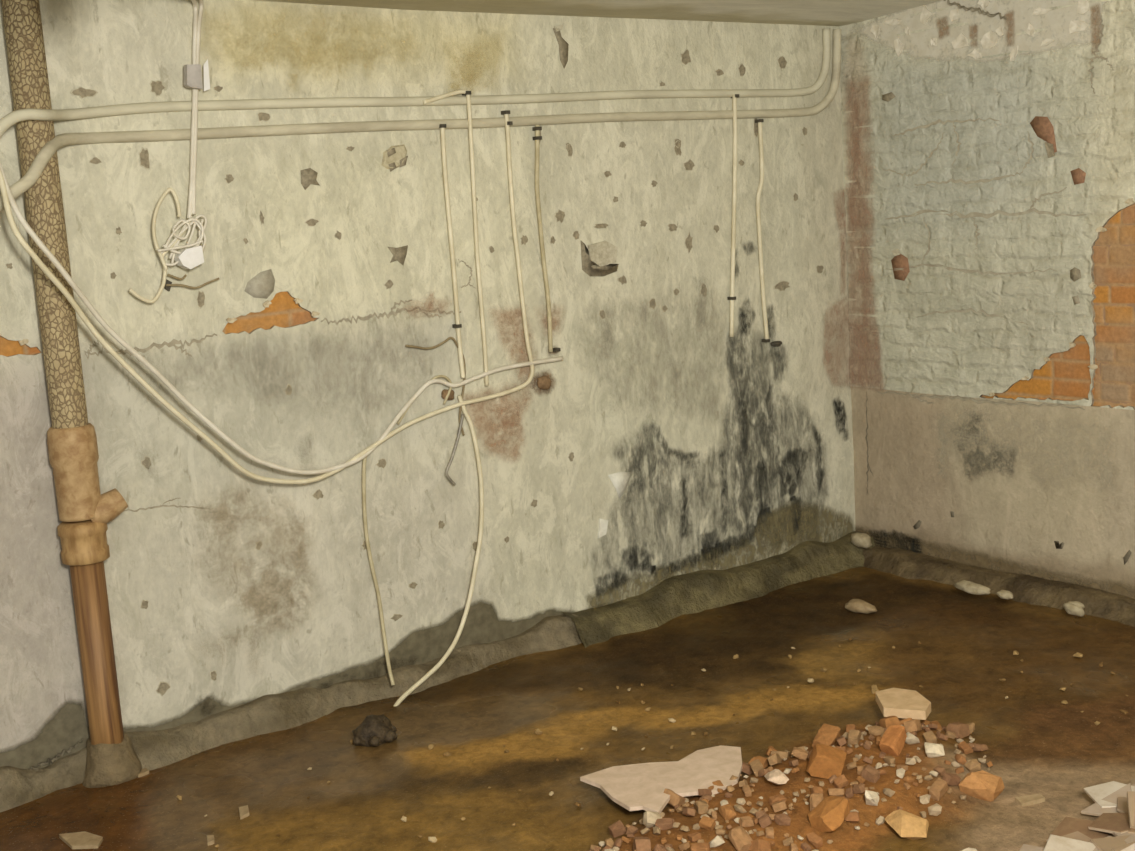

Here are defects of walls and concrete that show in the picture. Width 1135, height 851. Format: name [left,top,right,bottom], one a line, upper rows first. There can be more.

flaking render [1070,168,1086,185]
flaking render [0,334,40,357]
flaking render [222,269,320,334]
damp [740,309,754,334]
flaking render [981,198,1135,408]
damp [595,317,824,608]
damp [283,601,575,693]
damp [0,702,90,769]
damp [123,697,253,732]